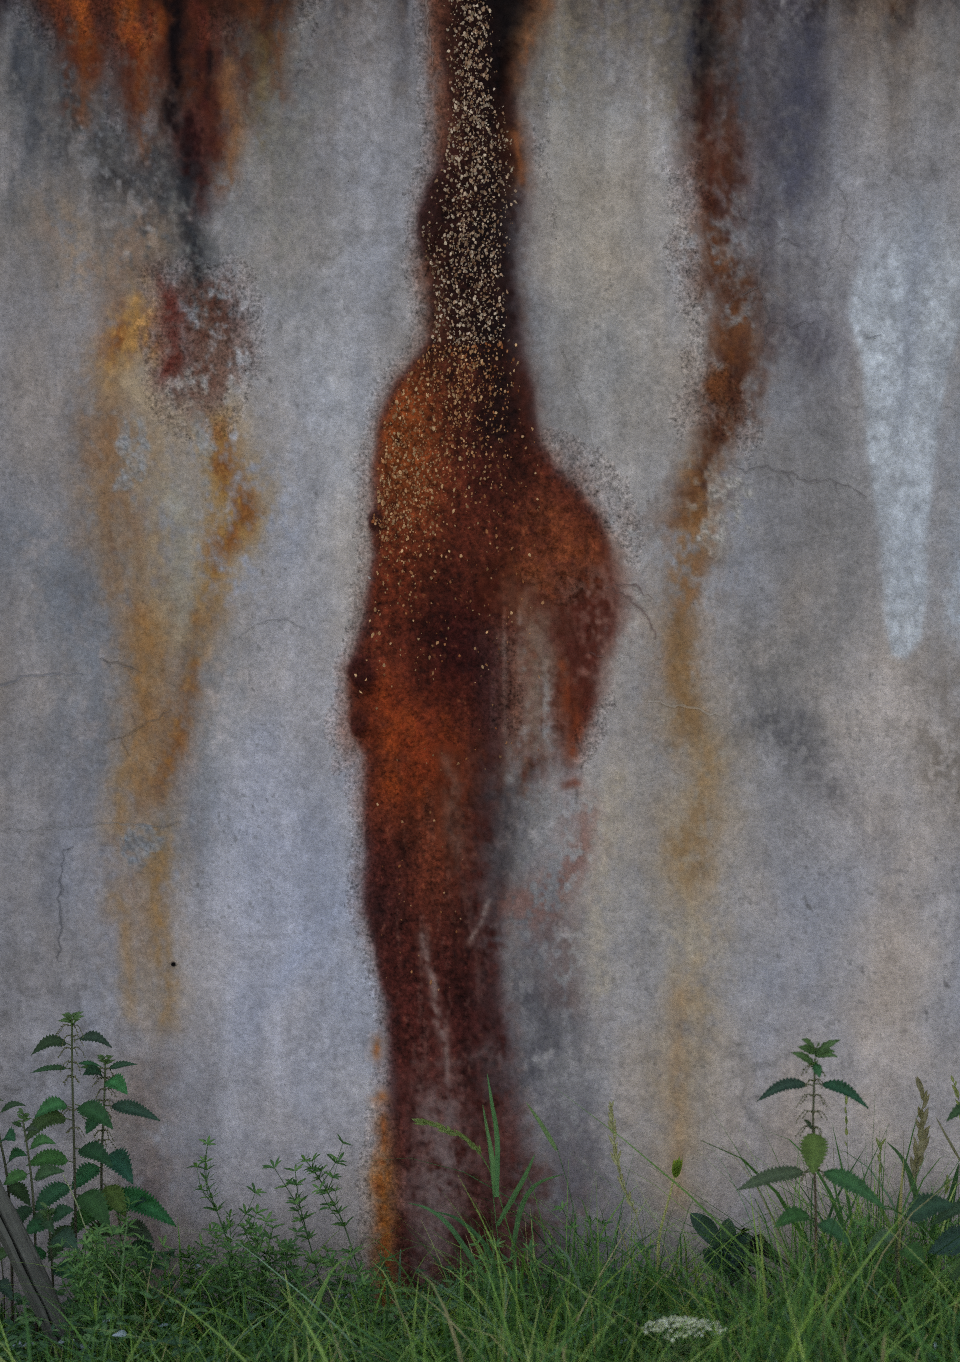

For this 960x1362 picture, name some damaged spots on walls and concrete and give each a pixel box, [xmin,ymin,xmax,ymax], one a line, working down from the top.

rust [68,742,197,1039]
rust [7,0,329,657]
rust [324,0,779,1325]
damp [476,0,960,934]